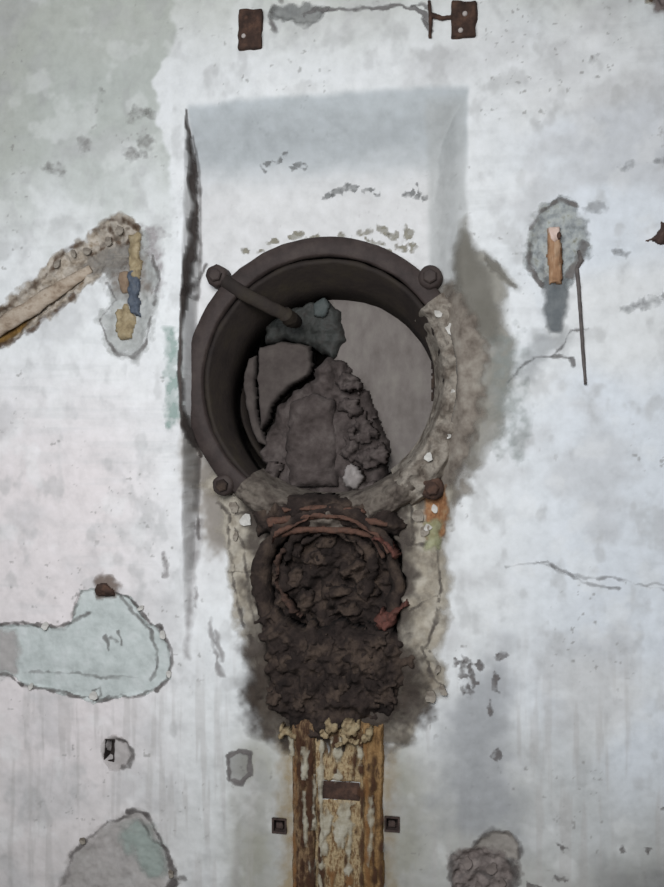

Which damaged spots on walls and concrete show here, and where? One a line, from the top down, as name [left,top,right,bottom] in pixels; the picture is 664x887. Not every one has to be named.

crack [304,4,433,32]
flaking render [526,195,590,289]
flaking render [99,229,161,360]
damp [391,233,514,506]
rust [424,488,449,549]
peeling [0,588,173,704]
flaking render [102,736,134,770]
peeling [60,809,178,887]
flaking render [226,749,253,786]
rust [284,732,384,887]